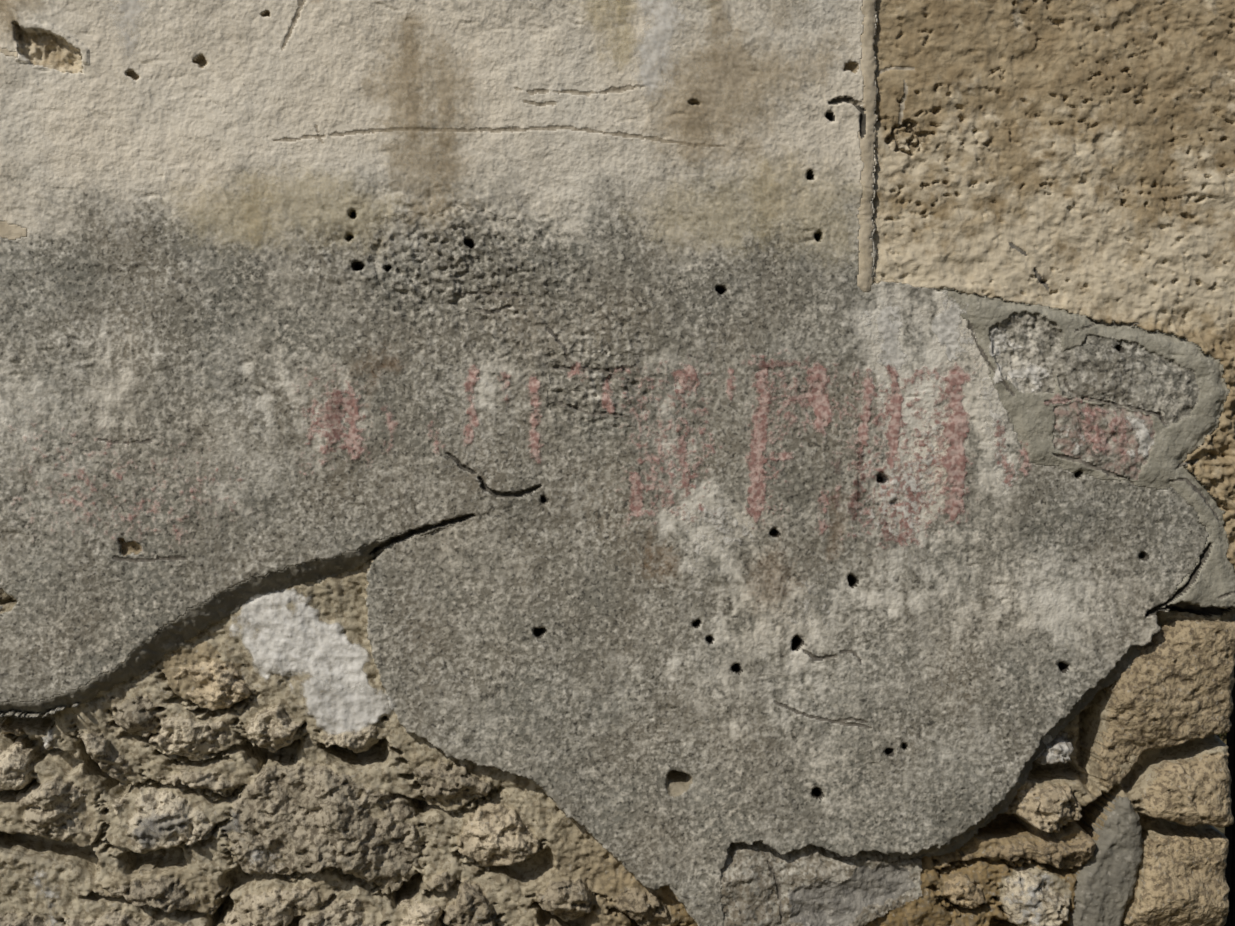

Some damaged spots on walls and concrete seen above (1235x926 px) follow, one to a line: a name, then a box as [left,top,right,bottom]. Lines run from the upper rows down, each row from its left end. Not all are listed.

crack [273,85,725,148]
flaking render [119,538,142,556]
crack [369,453,542,555]
crack [1146,458,1235,618]
spalling [0,588,18,614]
spalling [721,841,922,926]